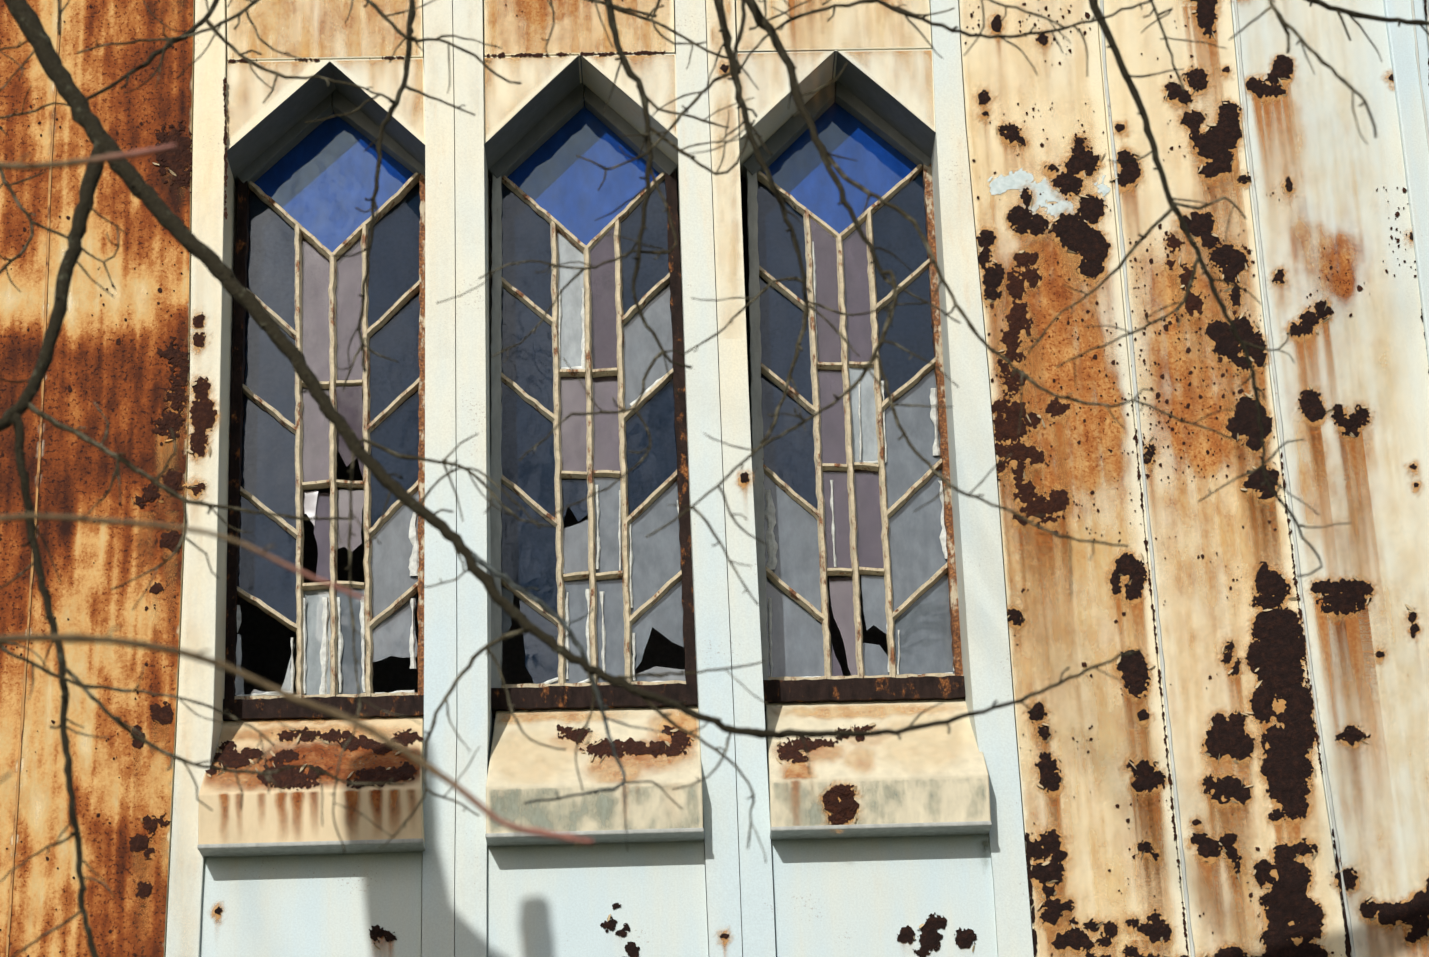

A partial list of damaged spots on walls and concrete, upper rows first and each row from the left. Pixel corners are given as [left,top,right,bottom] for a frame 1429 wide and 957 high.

corrosion [485,0,662,87]
peeling [988,168,1075,219]
peeling [1094,175,1110,200]
corrosion [0,0,219,957]
corrosion [976,0,1388,957]
corrosion [1393,604,1421,638]
corrosion [206,719,420,824]
corrosion [592,712,697,780]
corrosion [820,783,859,825]
corrosion [600,903,640,957]
corrosion [897,912,977,957]
corrosion [1333,867,1429,957]